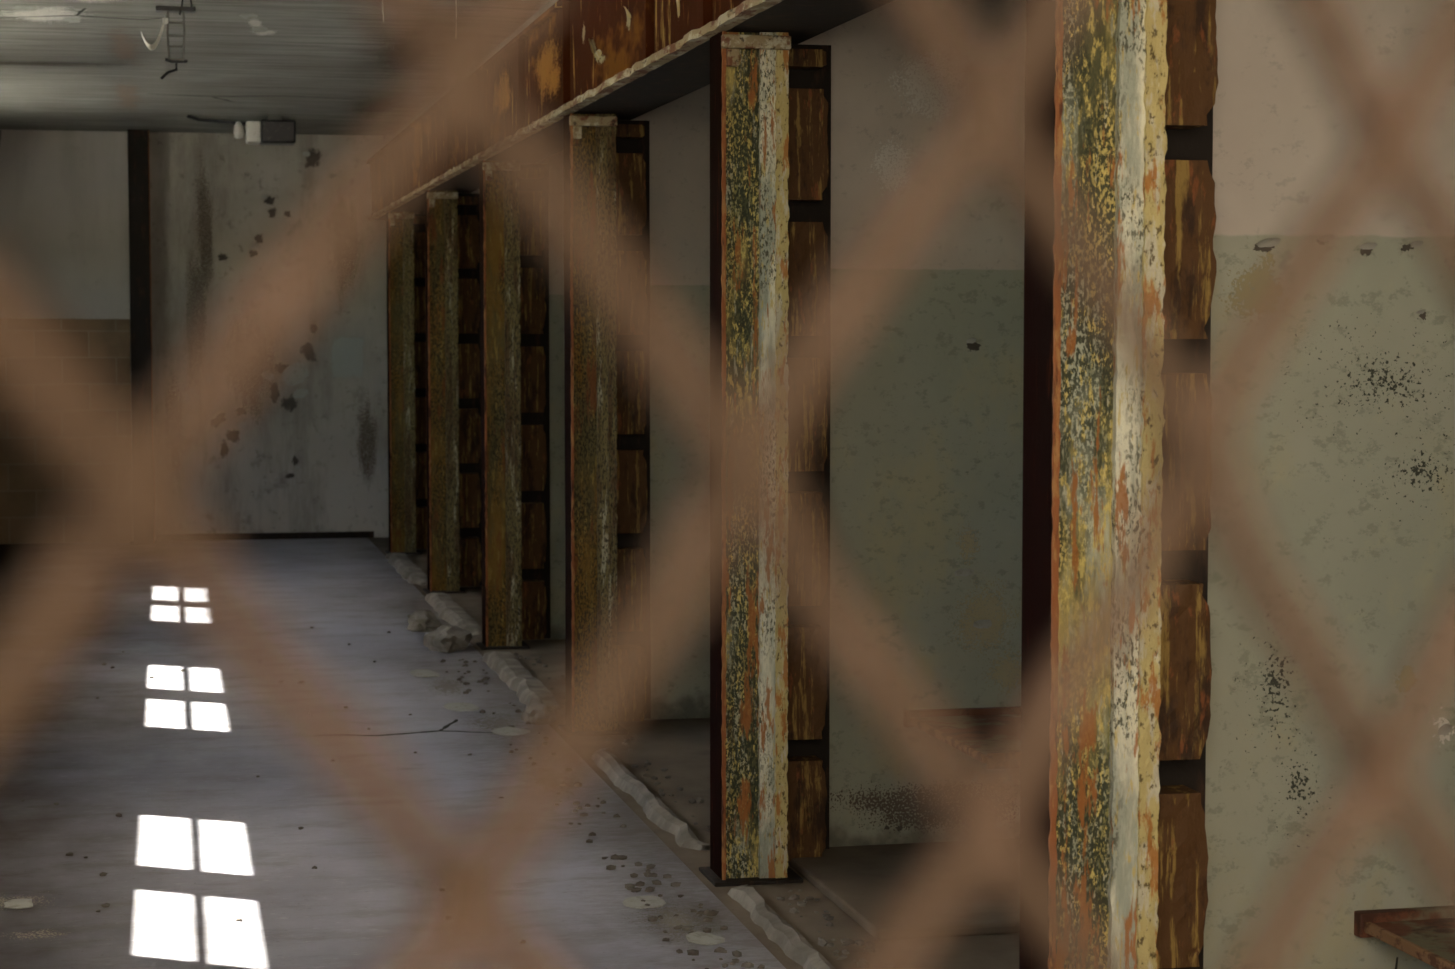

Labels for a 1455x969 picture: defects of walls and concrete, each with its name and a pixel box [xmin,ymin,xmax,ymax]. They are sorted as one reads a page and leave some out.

corrosion [529,27,562,113]
peeling [302,148,323,169]
peeling [261,194,292,218]
peeling [261,322,318,413]
leakage [1282,313,1455,521]
leakage [1234,637,1333,847]